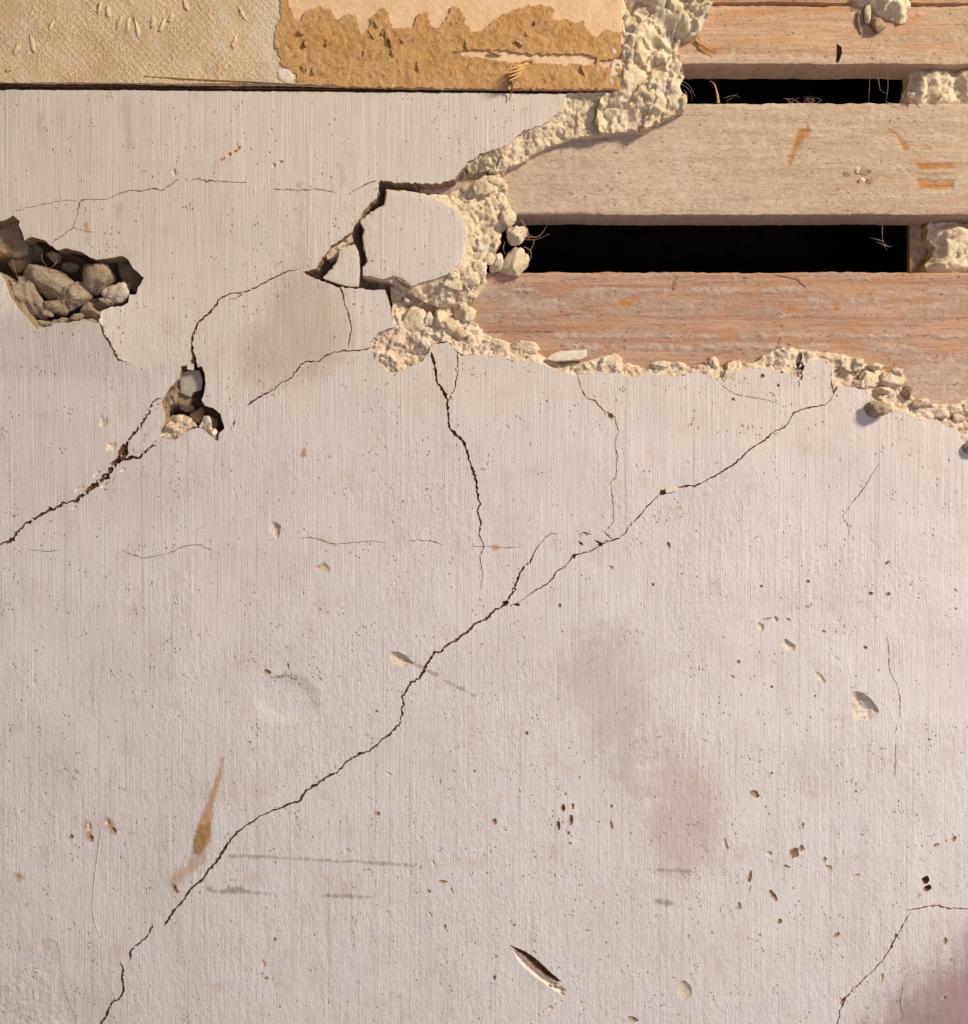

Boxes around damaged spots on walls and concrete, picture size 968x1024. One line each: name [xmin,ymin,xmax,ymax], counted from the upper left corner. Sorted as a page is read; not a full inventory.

flaking render [466,0,713,177]
spalling [0,223,144,327]
spalling [133,361,224,453]
crack [190,268,302,363]
crack [231,288,372,430]
flaking render [310,260,339,288]
flaking render [354,186,968,442]
crack [0,398,161,552]
crack [100,352,832,1024]
rust [173,774,221,886]
spalling [510,945,566,1011]
crack [837,905,968,1024]